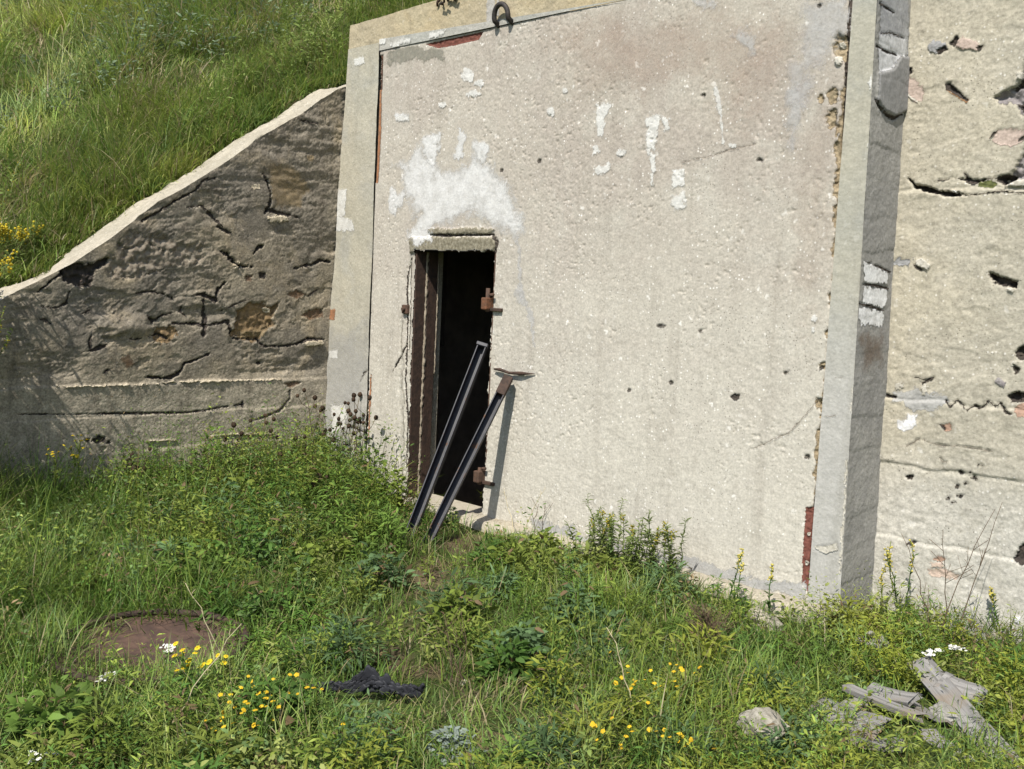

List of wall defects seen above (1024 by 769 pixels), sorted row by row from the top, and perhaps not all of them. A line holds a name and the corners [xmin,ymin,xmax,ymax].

corrosion [426,32,483,48]
spalling [928,36,983,54]
peeling [867,35,924,103]
spalling [945,83,969,103]
spalling [995,71,1024,115]
crack [909,173,1024,197]
damp [388,128,535,346]
spalling [38,231,204,324]
crack [130,282,324,379]
crack [19,382,300,420]
crack [946,400,1011,415]
corrosion [802,506,814,591]